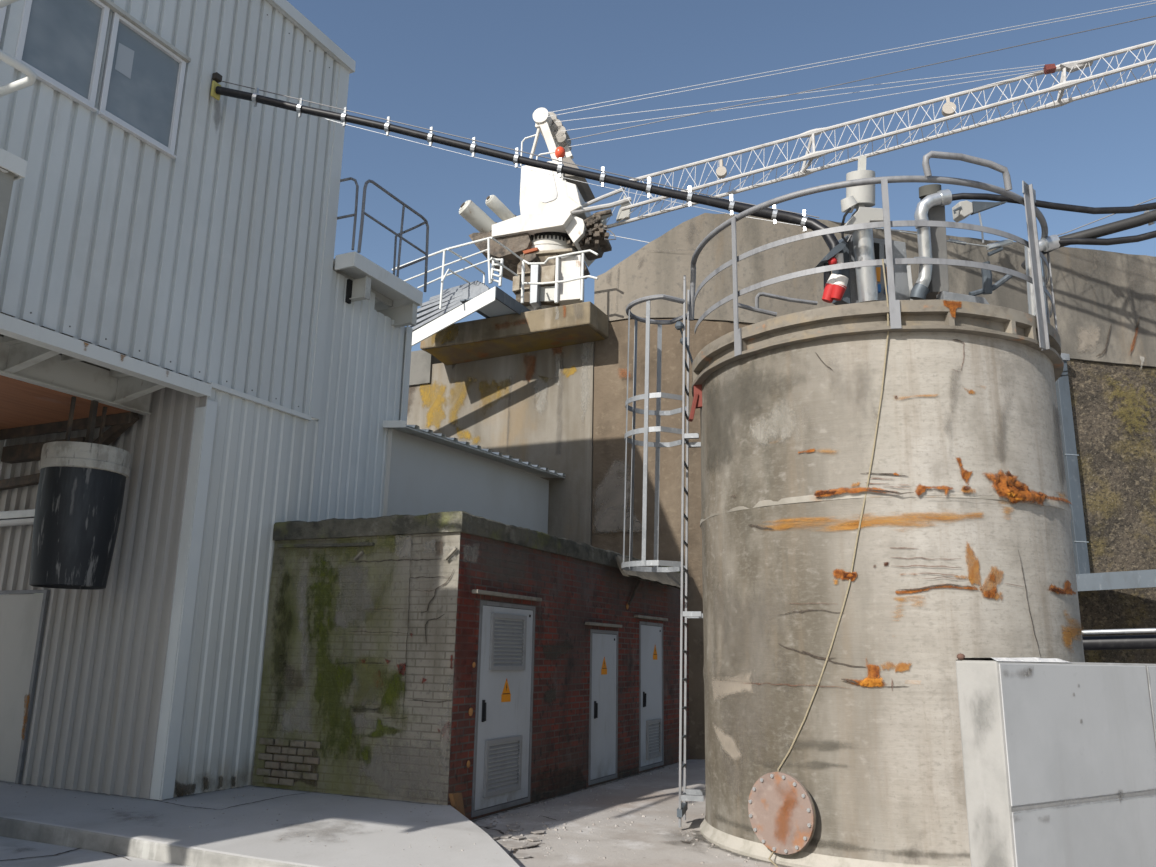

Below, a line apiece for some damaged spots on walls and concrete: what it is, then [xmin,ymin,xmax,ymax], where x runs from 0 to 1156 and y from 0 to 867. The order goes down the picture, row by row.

peeling [419,377,509,443]
rust [814,458,1071,513]
rust [748,513,983,531]
rust [833,569,857,584]
rust [874,543,1023,600]
rust [1049,581,1076,595]
crack [341,559,454,734]
rust [1062,614,1083,648]
rust [751,659,911,688]
rust [776,795,795,838]